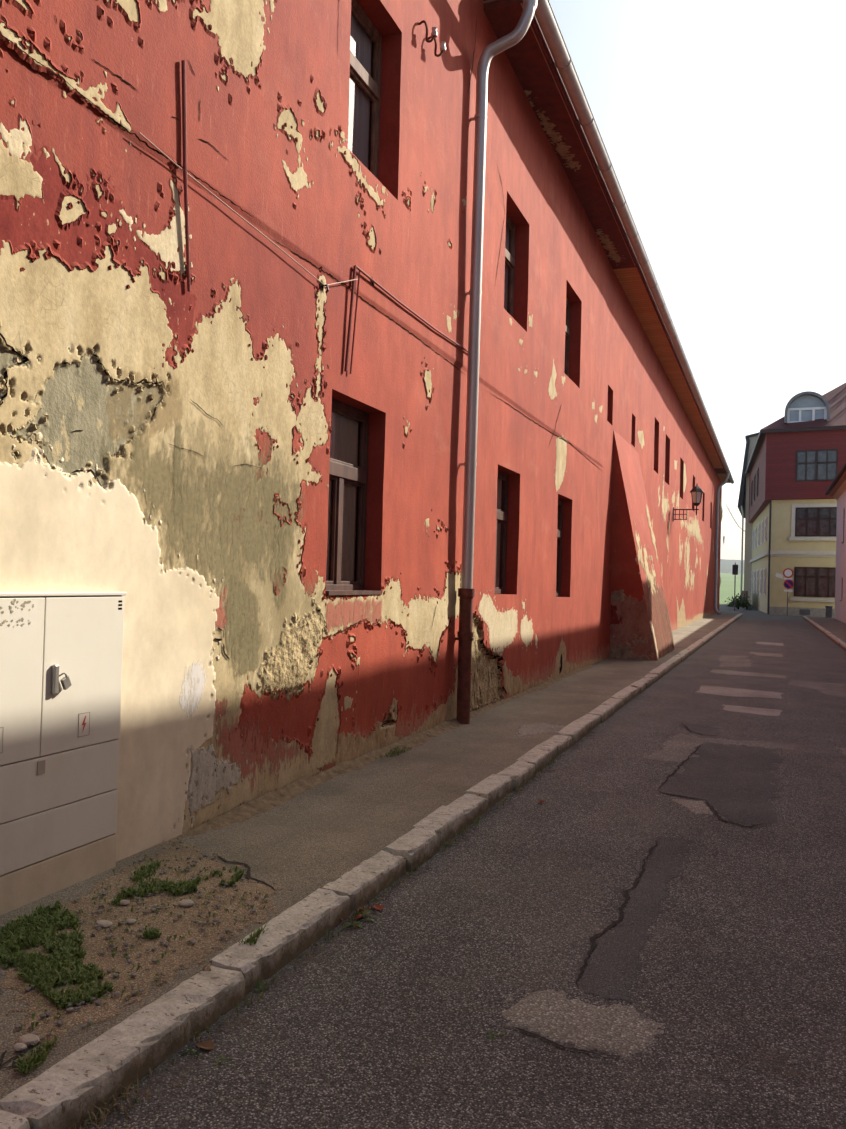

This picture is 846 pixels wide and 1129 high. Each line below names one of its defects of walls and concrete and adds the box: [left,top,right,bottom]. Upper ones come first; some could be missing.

peeling [0,0,142,156]
peeling [96,0,278,106]
crack [0,33,466,375]
crack [0,333,29,405]
crack [59,348,224,456]
peeling [0,74,461,834]
crack [491,393,603,472]
flaking render [478,460,725,697]